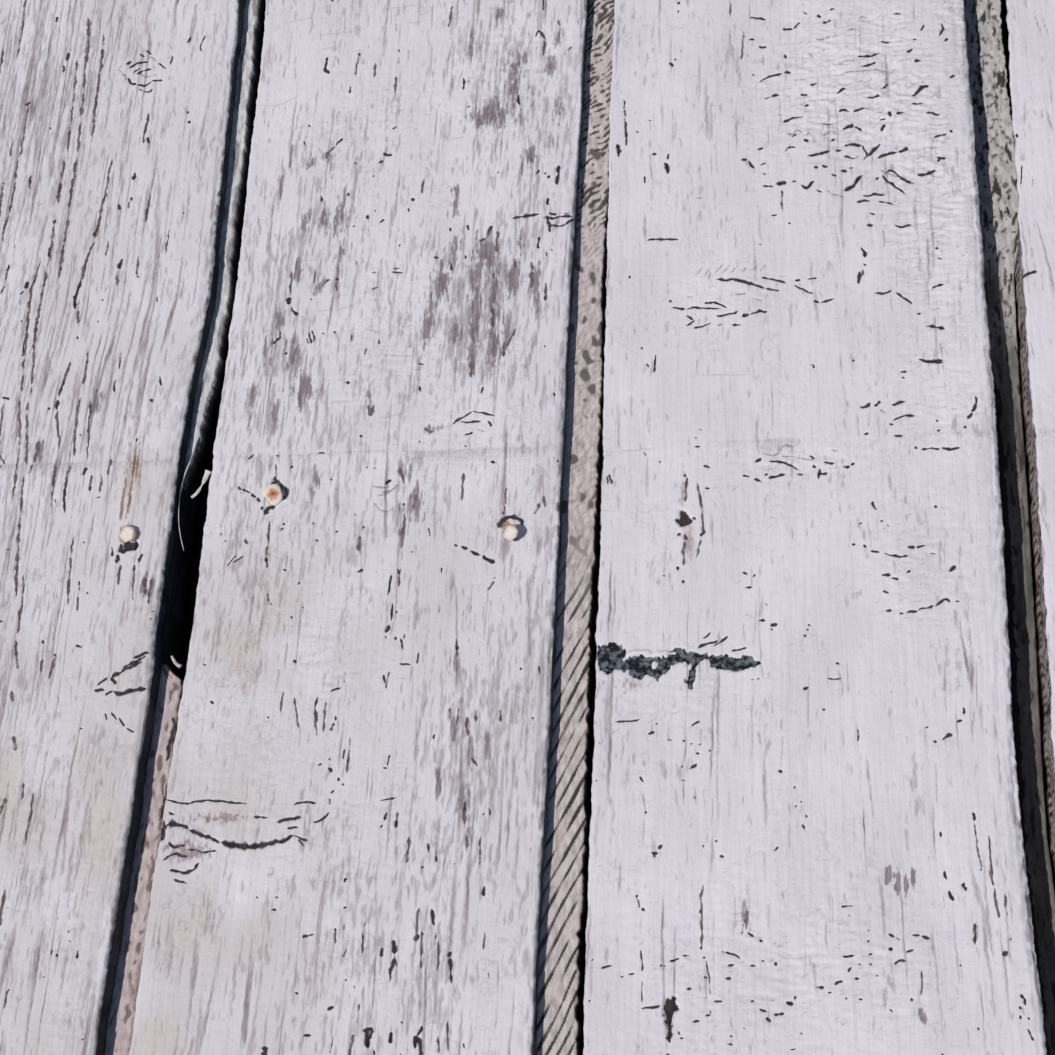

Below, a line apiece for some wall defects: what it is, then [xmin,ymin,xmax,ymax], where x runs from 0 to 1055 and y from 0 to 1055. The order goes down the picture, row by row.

corrosion [119,449,139,519]
corrosion [123,541,139,551]
spalling [597,633,761,690]
crack [159,688,350,884]